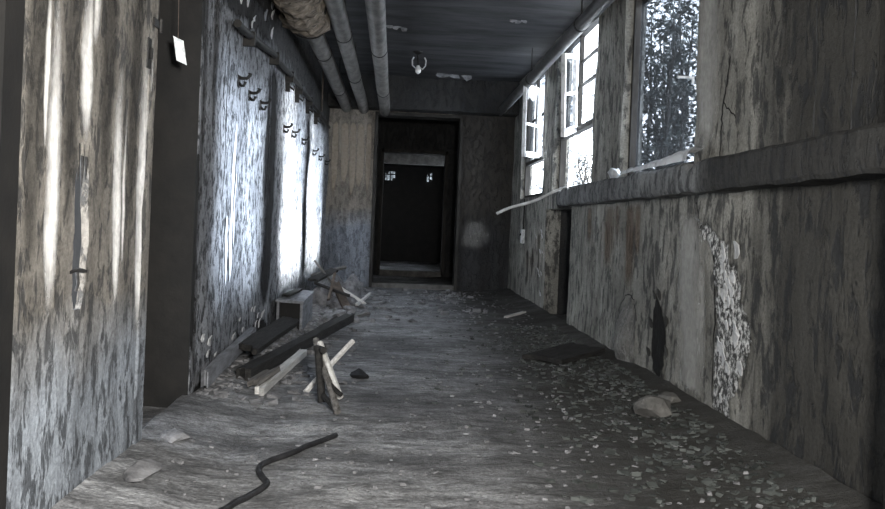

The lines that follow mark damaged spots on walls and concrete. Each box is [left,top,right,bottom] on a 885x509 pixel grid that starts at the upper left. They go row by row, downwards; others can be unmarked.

spalling [699,223,752,418]